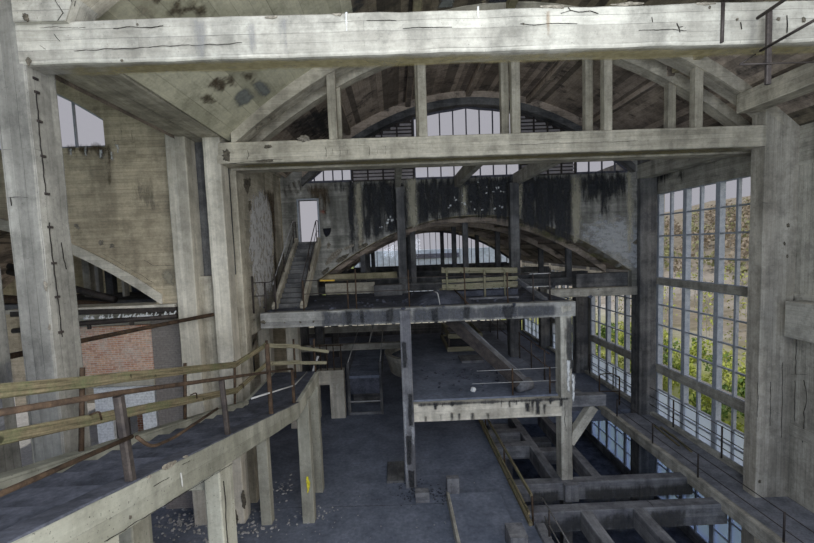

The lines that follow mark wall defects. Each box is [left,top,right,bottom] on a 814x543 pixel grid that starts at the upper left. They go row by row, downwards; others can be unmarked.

crack [41,0,86,49]
crack [78,25,242,51]
crack [524,7,599,25]
crack [8,93,46,206]
crack [49,222,67,337]
peeling [243,177,274,307]
water stain [348,177,509,252]
water stain [519,172,637,268]
crack [757,342,807,442]